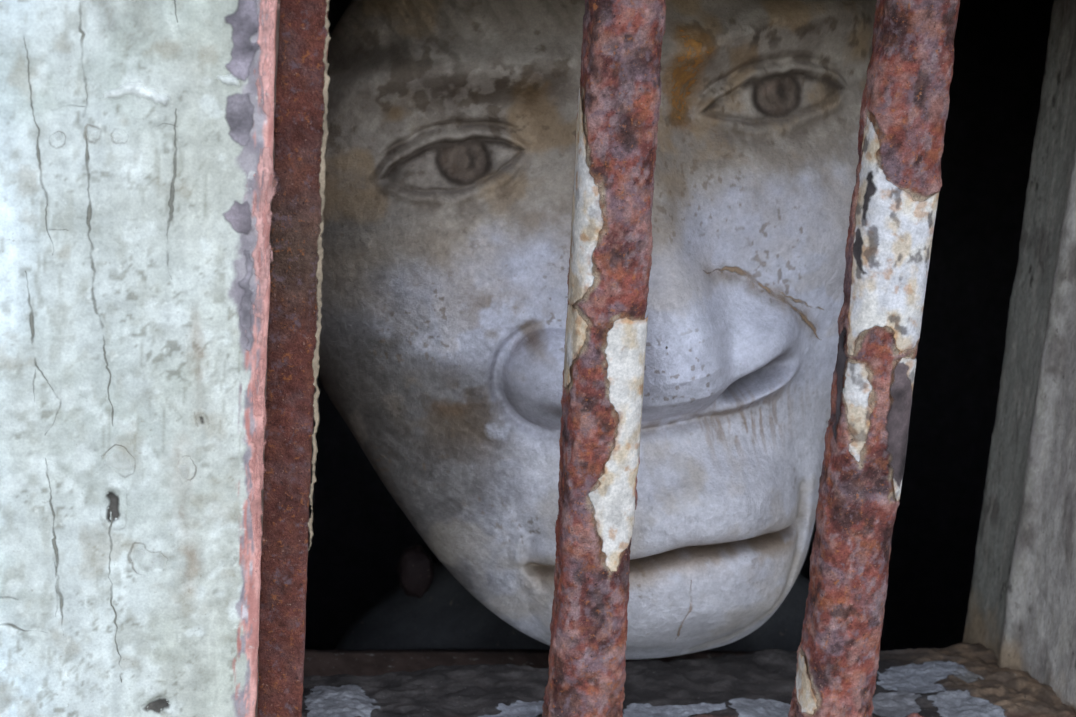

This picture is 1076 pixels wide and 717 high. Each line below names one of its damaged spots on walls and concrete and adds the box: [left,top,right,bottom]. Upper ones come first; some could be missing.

peeling [225,0,276,146]
crack [25,271,48,399]
crack [45,140,97,313]
crack [167,108,177,232]
peeling [224,147,275,351]
peeling [563,87,604,388]
peeling [588,317,648,572]
corrosion [832,328,847,443]
corrosion [853,171,876,274]
peeling [842,117,939,462]
corrosion [886,363,913,487]
crack [45,458,63,618]